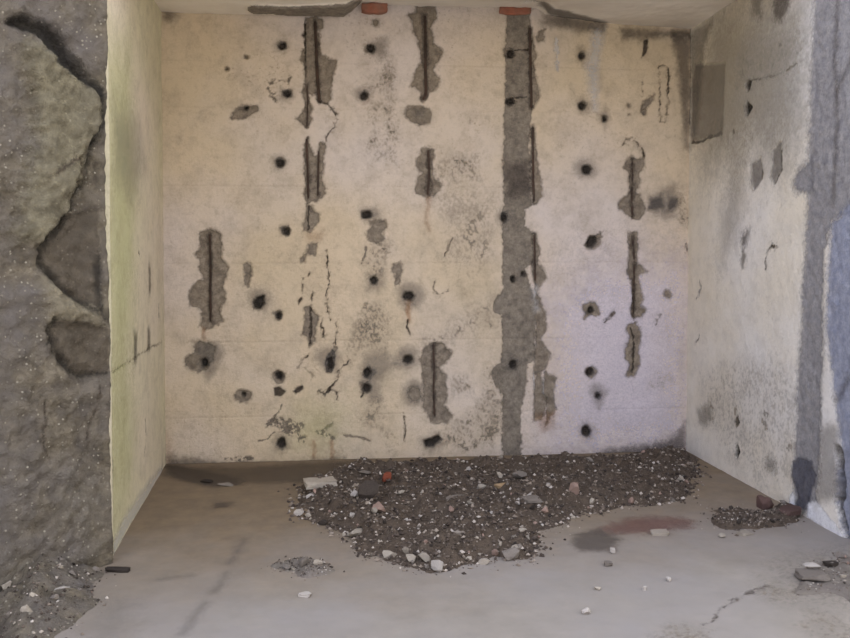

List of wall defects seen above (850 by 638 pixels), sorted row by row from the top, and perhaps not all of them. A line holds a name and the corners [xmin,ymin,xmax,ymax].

spalling [405,6,442,126]
spalling [528,28,546,108]
spalling [297,16,337,233]
spalling [415,148,442,197]
spalling [531,128,543,205]
spalling [618,157,645,220]
spalling [185,341,216,372]
spalling [188,229,229,330]
crack [320,256,349,400]
spalling [407,343,453,424]
spalling [532,234,556,425]
spalling [625,232,648,376]